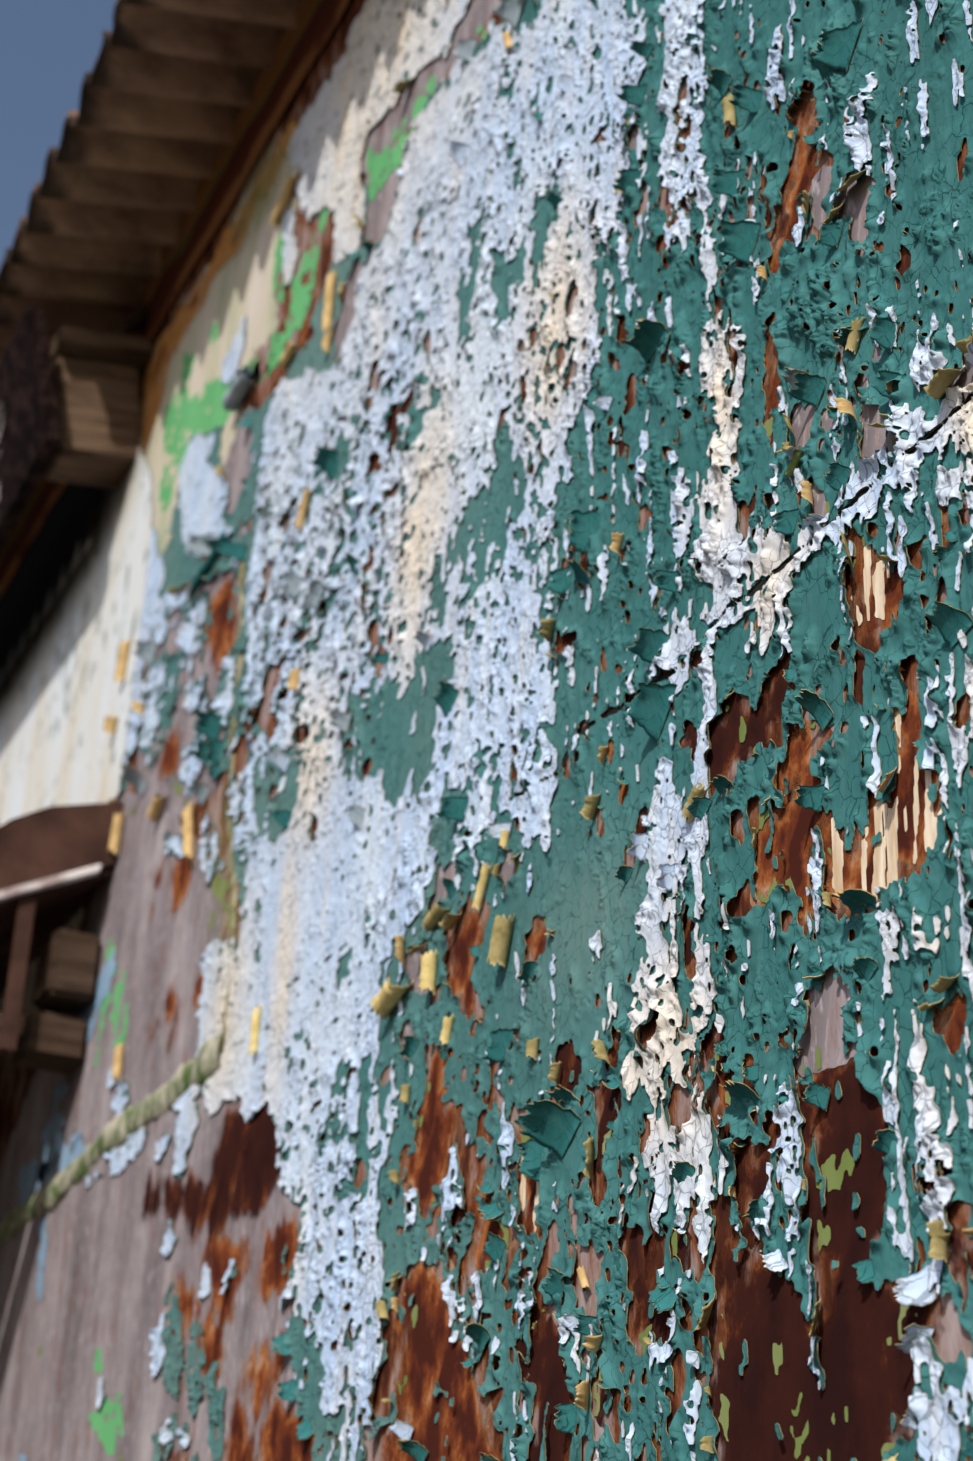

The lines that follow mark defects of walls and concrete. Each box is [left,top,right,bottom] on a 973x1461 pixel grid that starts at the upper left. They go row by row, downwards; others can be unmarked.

peeling [321,0,527,365]
peeling [771,314,907,536]
crack [515,393,973,797]
rust [838,527,905,631]
peeling [0,365,328,1461]
rust [142,1105,301,1381]
rust [224,1332,319,1461]
peeling [370,861,457,1062]
rust [375,862,623,1461]
rust [679,648,949,940]
rust [695,1063,973,1461]
peeling [793,957,878,1077]